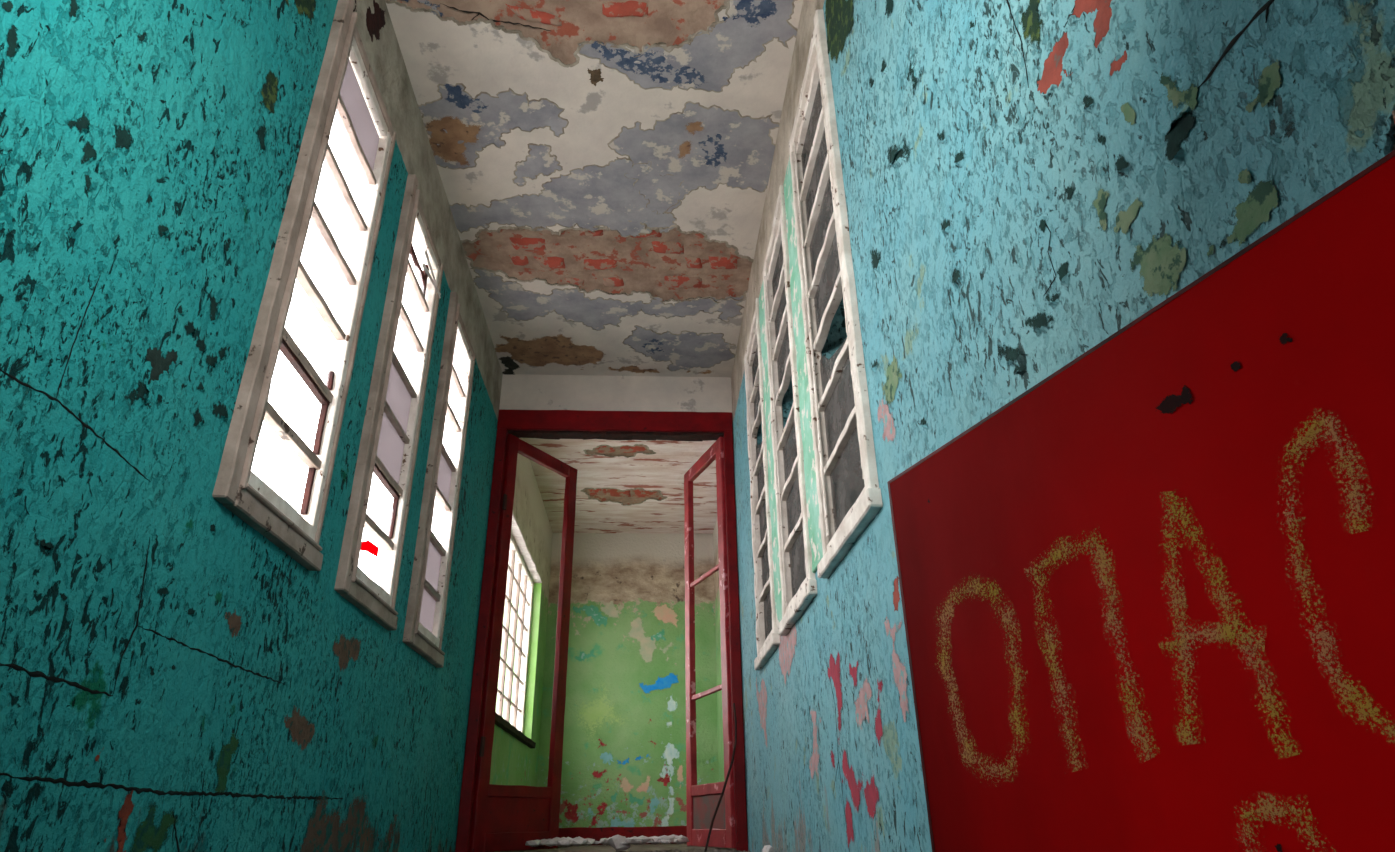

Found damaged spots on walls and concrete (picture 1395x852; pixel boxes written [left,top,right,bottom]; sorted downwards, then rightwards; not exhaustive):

peeling [825,0,854,70]
peeling [1020,0,1129,98]
peeling [1159,72,1204,169]
flaking render [385,0,798,372]
crack [0,274,148,480]
flaking render [583,444,656,458]
flaking render [581,488,667,506]
crack [0,539,285,696]
peeling [572,600,679,694]
peeling [882,574,909,722]
crack [0,773,343,852]
peeling [563,719,684,827]